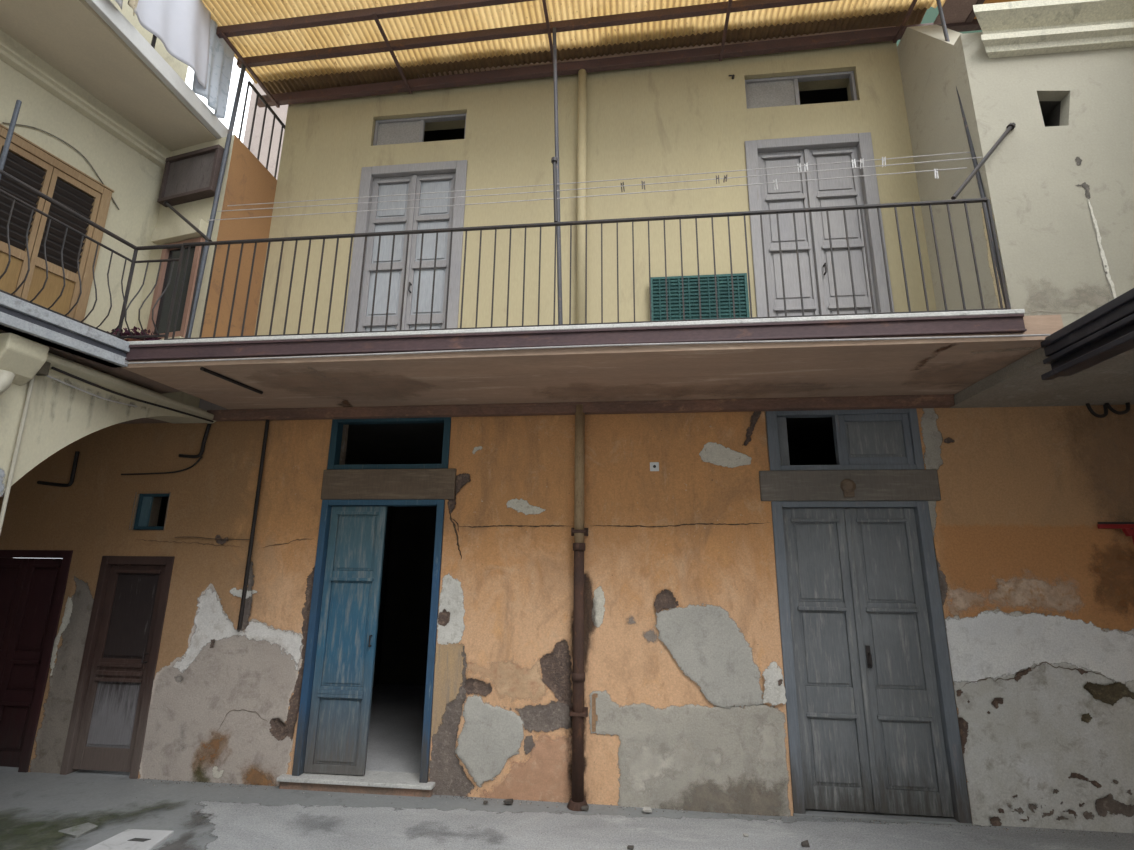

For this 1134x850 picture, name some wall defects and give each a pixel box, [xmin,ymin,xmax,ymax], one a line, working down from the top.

peeling [699,411,761,468]
peeling [506,498,546,515]
crack [136,538,314,548]
crack [449,512,768,558]
flaking render [438,609,450,626]
peeling [592,586,605,628]
peeling [30,576,94,774]
peeling [139,561,315,786]
peeling [935,549,1134,833]
peeling [429,639,573,804]
rust [193,733,227,768]